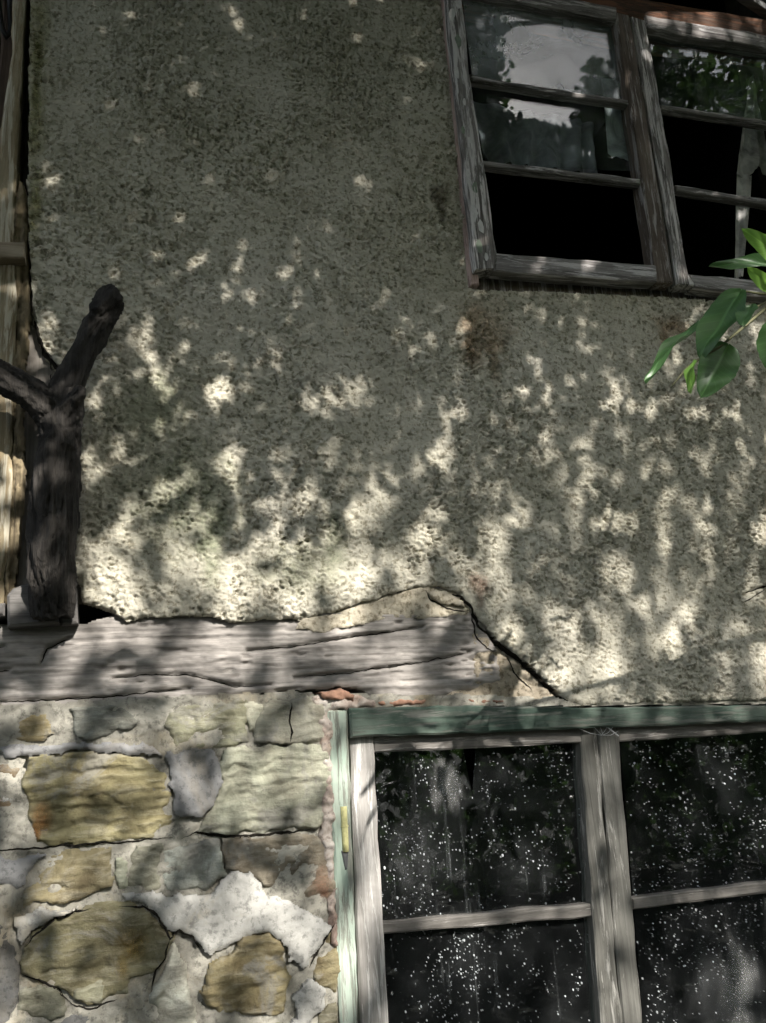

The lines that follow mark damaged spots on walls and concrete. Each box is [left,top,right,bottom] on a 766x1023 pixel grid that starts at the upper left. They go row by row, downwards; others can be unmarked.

crack [251,628,417,651]
crack [297,590,571,703]